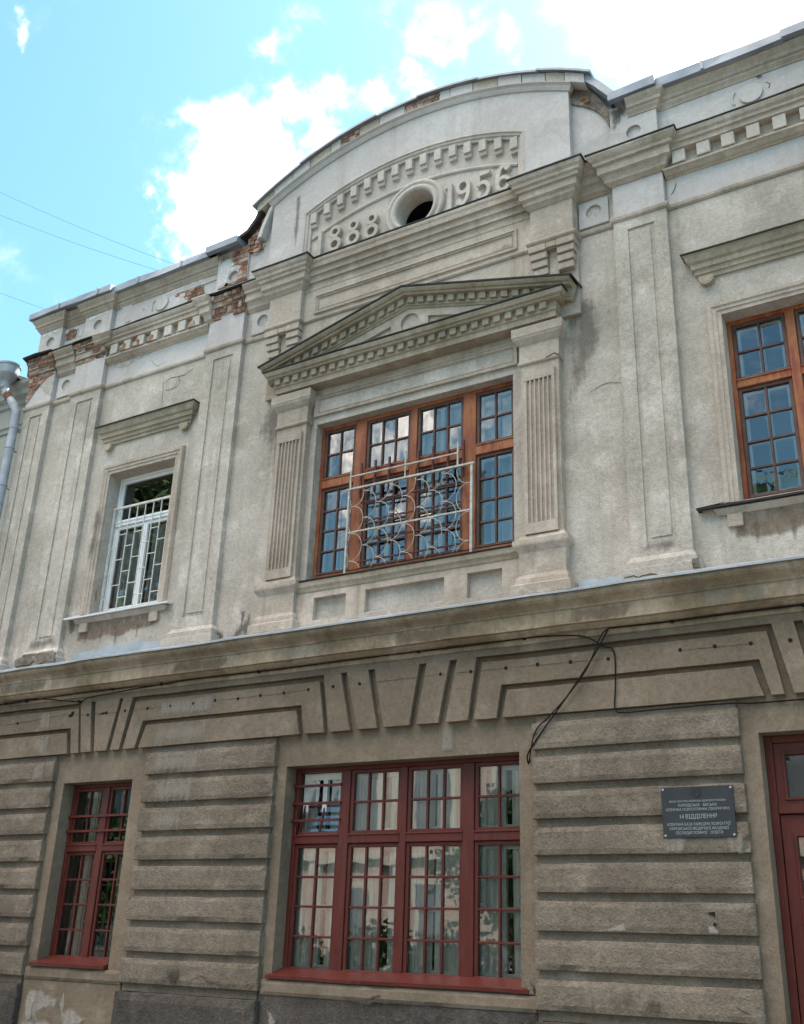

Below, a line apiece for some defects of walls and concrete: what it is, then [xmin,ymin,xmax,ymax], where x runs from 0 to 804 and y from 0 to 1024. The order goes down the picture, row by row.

flaking render [163,218,266,329]
flaking render [23,310,153,404]
flaking render [21,990,82,1024]